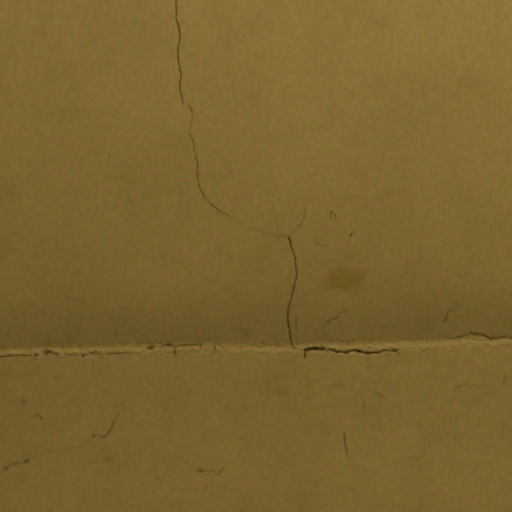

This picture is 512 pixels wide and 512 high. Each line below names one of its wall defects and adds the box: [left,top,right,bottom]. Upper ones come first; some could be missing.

crack [176,7,192,113]
crack [287,237,297,347]